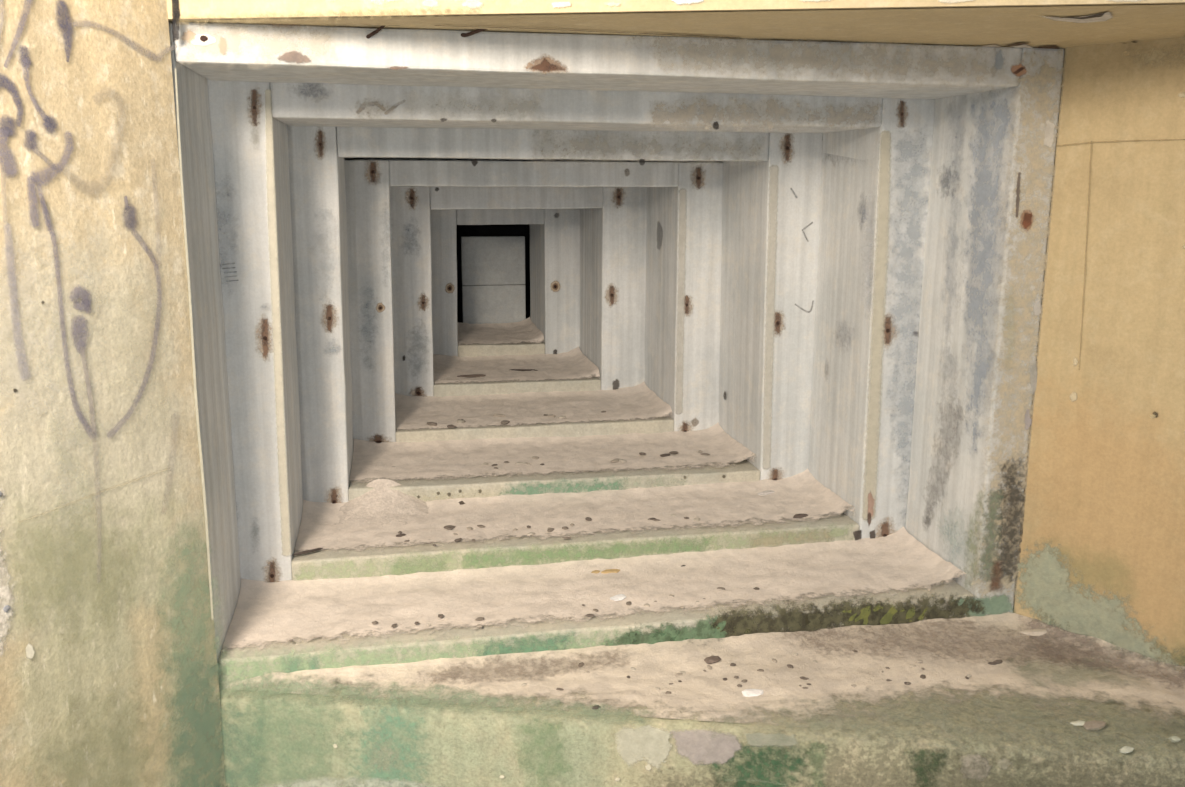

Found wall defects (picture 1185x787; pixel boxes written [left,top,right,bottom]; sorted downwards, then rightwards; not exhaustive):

corrosion [526,56,566,73]
corrosion [250,90,261,126]
corrosion [781,135,792,161]
corrosion [1016,172,1033,230]
leakage [967,101,1010,406]
corrosion [256,319,271,358]
corrosion [323,305,336,332]
leakage [980,460,1024,590]
corrosion [266,562,279,583]
spalling [0,548,13,655]
leakage [278,708,423,787]
leakage [713,745,819,787]